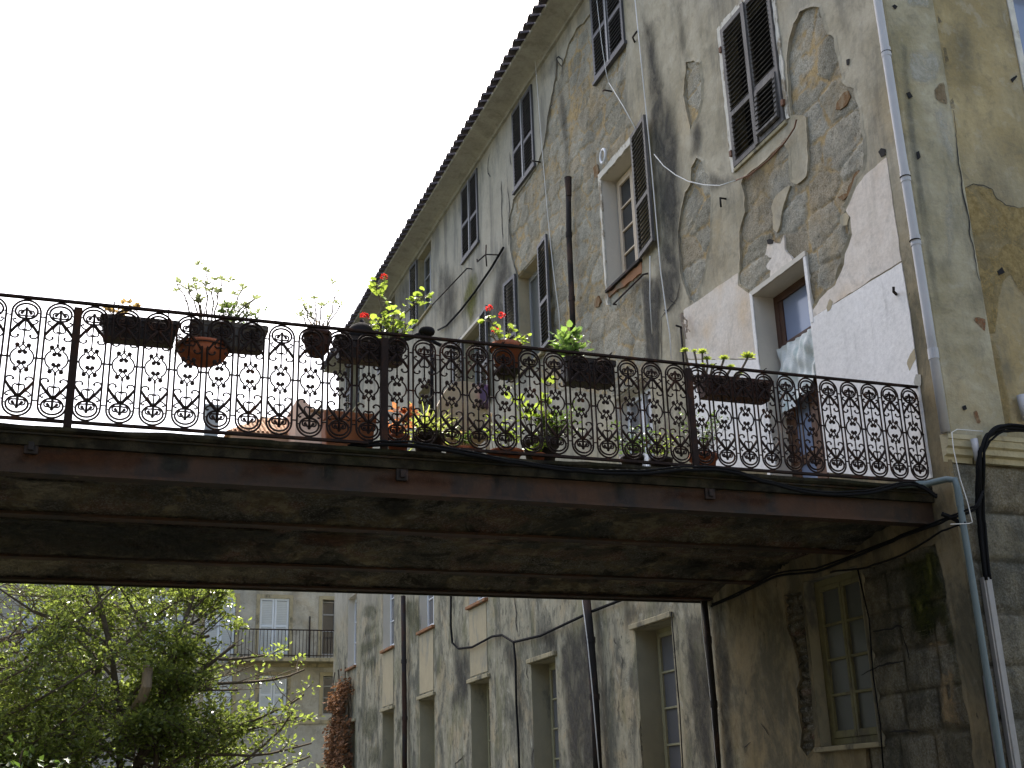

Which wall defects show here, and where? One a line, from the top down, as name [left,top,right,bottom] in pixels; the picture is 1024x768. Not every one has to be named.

water stain [642,29,679,371]
spalling [683,57,704,133]
spalling [677,156,713,303]
spalling [738,3,886,312]
spalling [783,589,817,759]